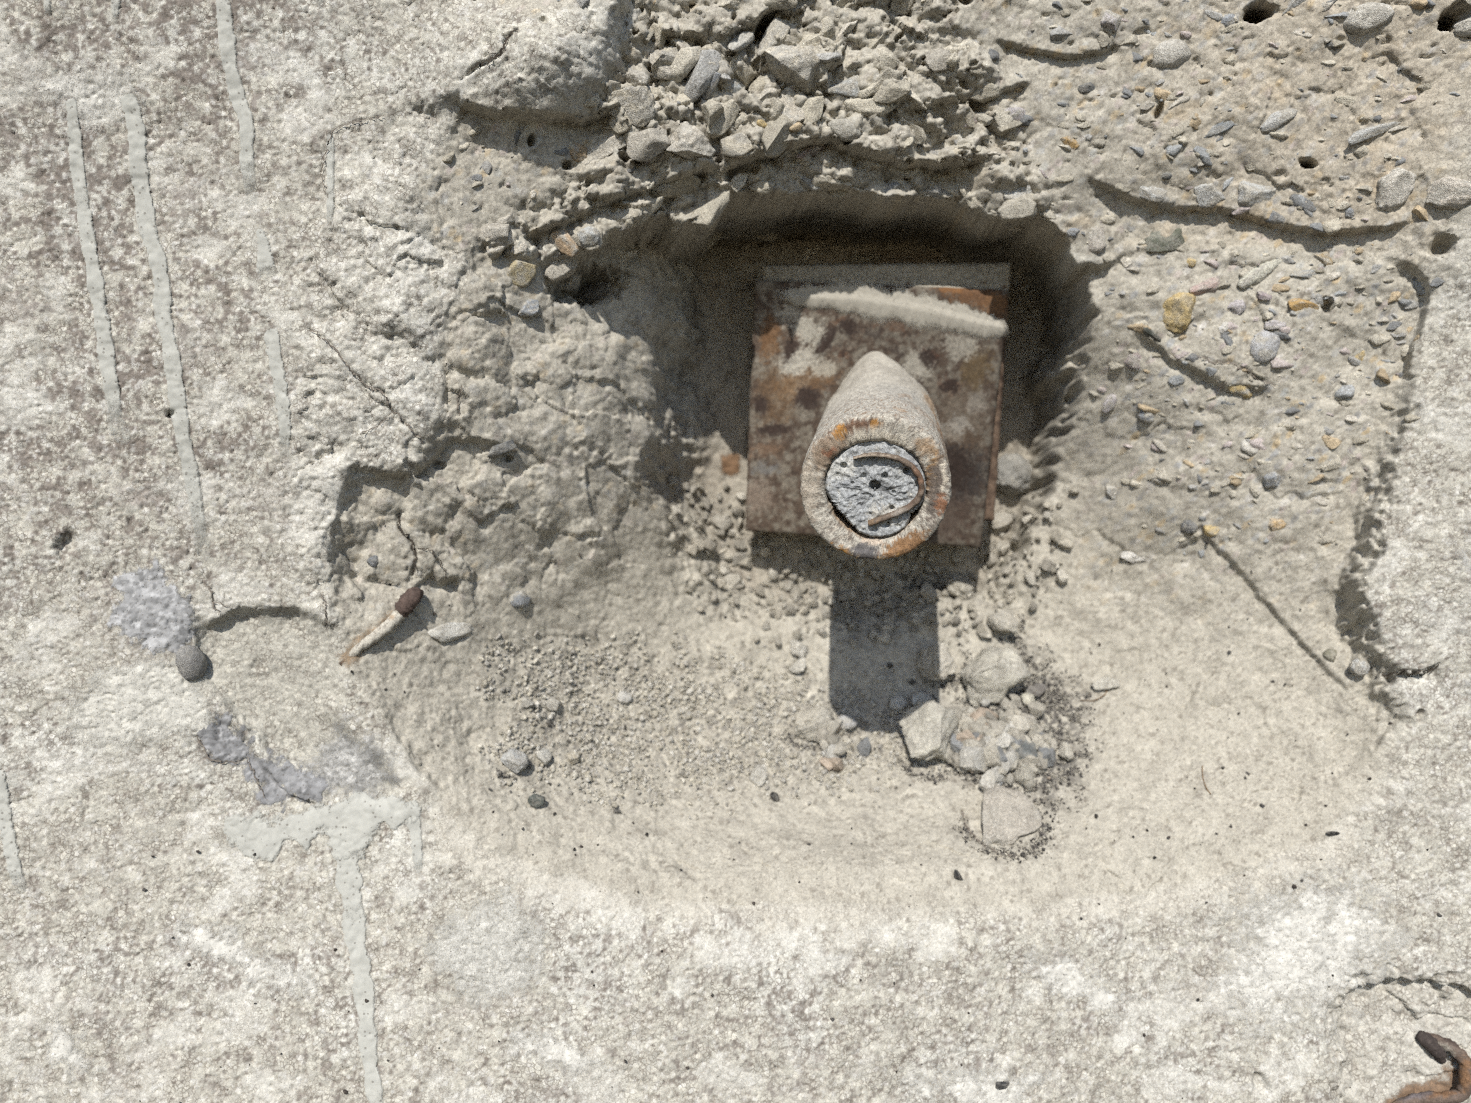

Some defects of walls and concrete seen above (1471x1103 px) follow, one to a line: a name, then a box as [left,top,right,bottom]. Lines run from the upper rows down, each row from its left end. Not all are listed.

spalling [417,0,1471,544]
spalling [1142,509,1206,558]
rust [1386,1057,1459,1103]